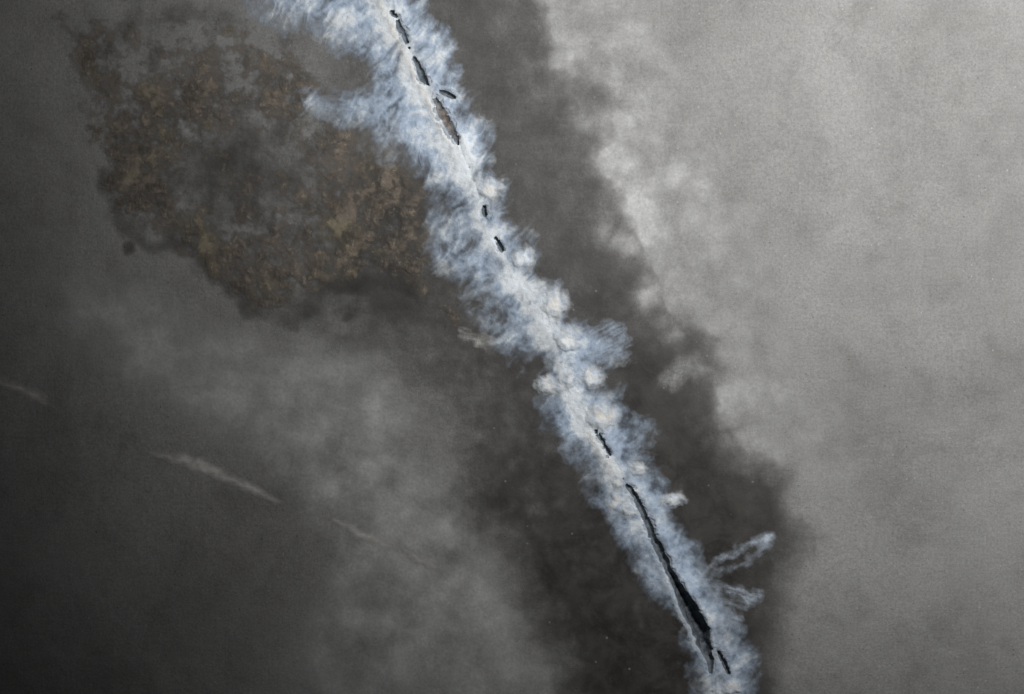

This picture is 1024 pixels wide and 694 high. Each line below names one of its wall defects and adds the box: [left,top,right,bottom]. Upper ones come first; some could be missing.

crack [389,10,477,181]
crack [480,204,514,260]
damp [268,0,789,694]
efflorescence [77,296,524,694]
crack [594,429,731,691]